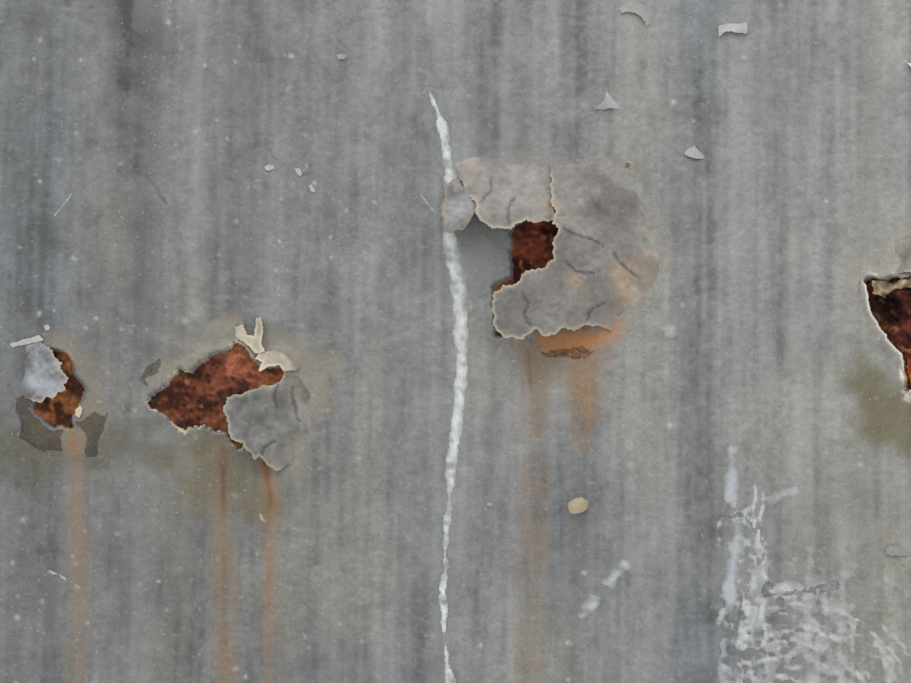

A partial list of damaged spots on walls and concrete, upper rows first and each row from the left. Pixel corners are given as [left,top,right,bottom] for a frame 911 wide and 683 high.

water stain [429,91,461,195]
peeling [10,324,110,454]
corrosion [0,395,302,683]
peeling [131,307,347,491]
water stain [437,226,469,683]
peeling [441,146,678,359]
water stain [714,444,911,683]
peeling [834,214,911,403]